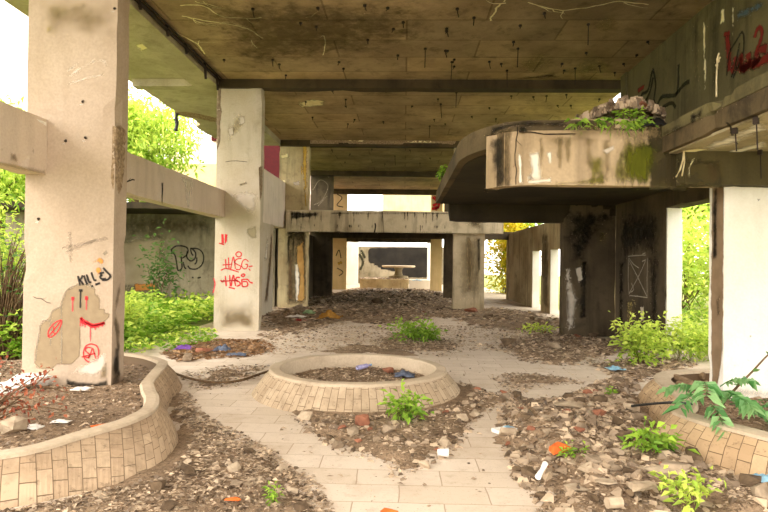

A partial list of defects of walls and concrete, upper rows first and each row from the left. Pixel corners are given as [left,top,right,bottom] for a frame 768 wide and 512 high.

leakage [217,8,391,57]
spalling [111,125,126,194]
leakage [488,122,562,189]
leakage [582,141,608,184]